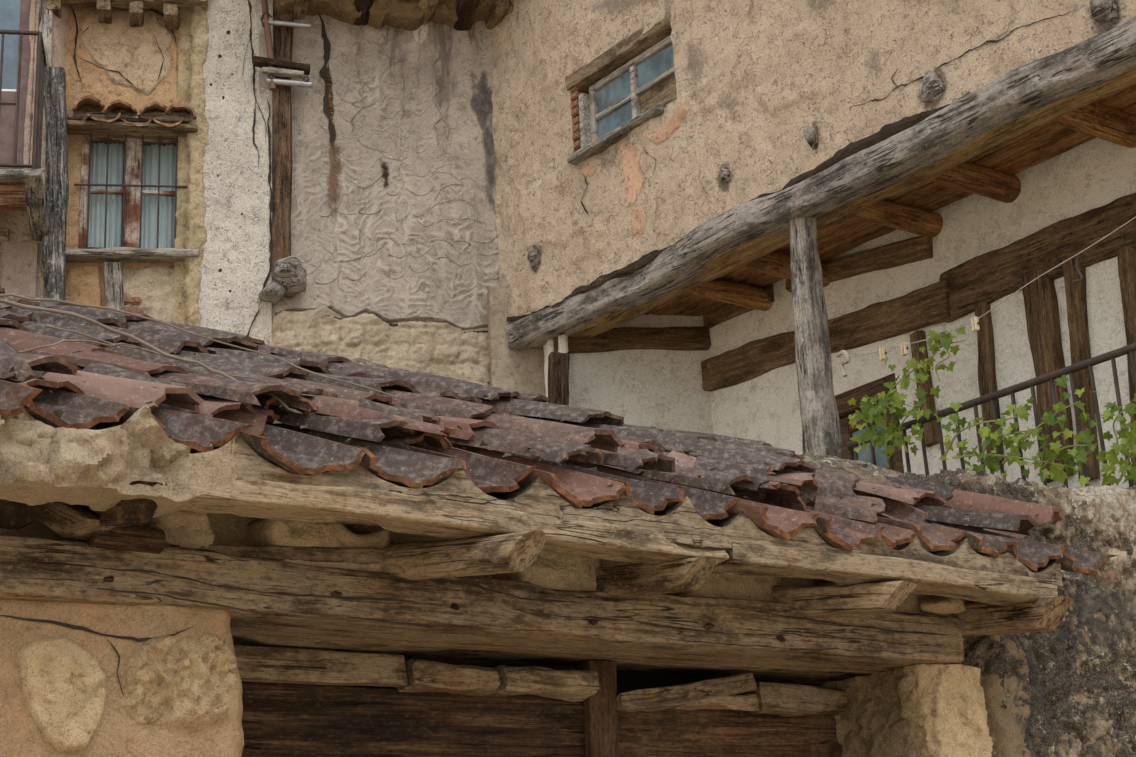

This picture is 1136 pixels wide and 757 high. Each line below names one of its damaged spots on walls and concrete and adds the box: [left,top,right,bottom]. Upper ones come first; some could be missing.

crack [71,6,164,88]
crack [319,14,336,153]
water stain [470,73,495,203]
spalling [646,102,690,145]
spalling [619,141,646,236]
water stain [1108,545,1136,567]
crack [0,615,196,694]